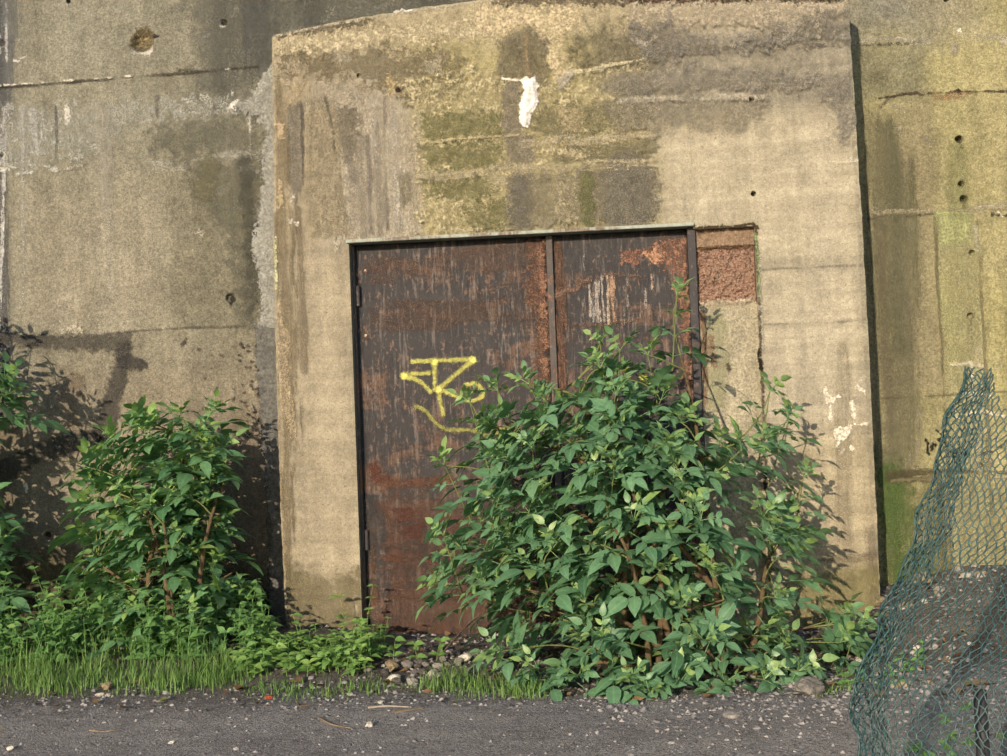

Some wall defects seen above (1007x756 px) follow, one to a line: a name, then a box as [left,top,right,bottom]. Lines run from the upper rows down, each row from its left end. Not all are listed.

spalling [130,26,159,57]
crack [878,88,1007,109]
leakage [0,0,930,600]
rust [516,233,731,412]
spalling [699,296,756,312]
crack [694,222,769,501]
rust [364,461,556,634]
crack [766,535,774,602]